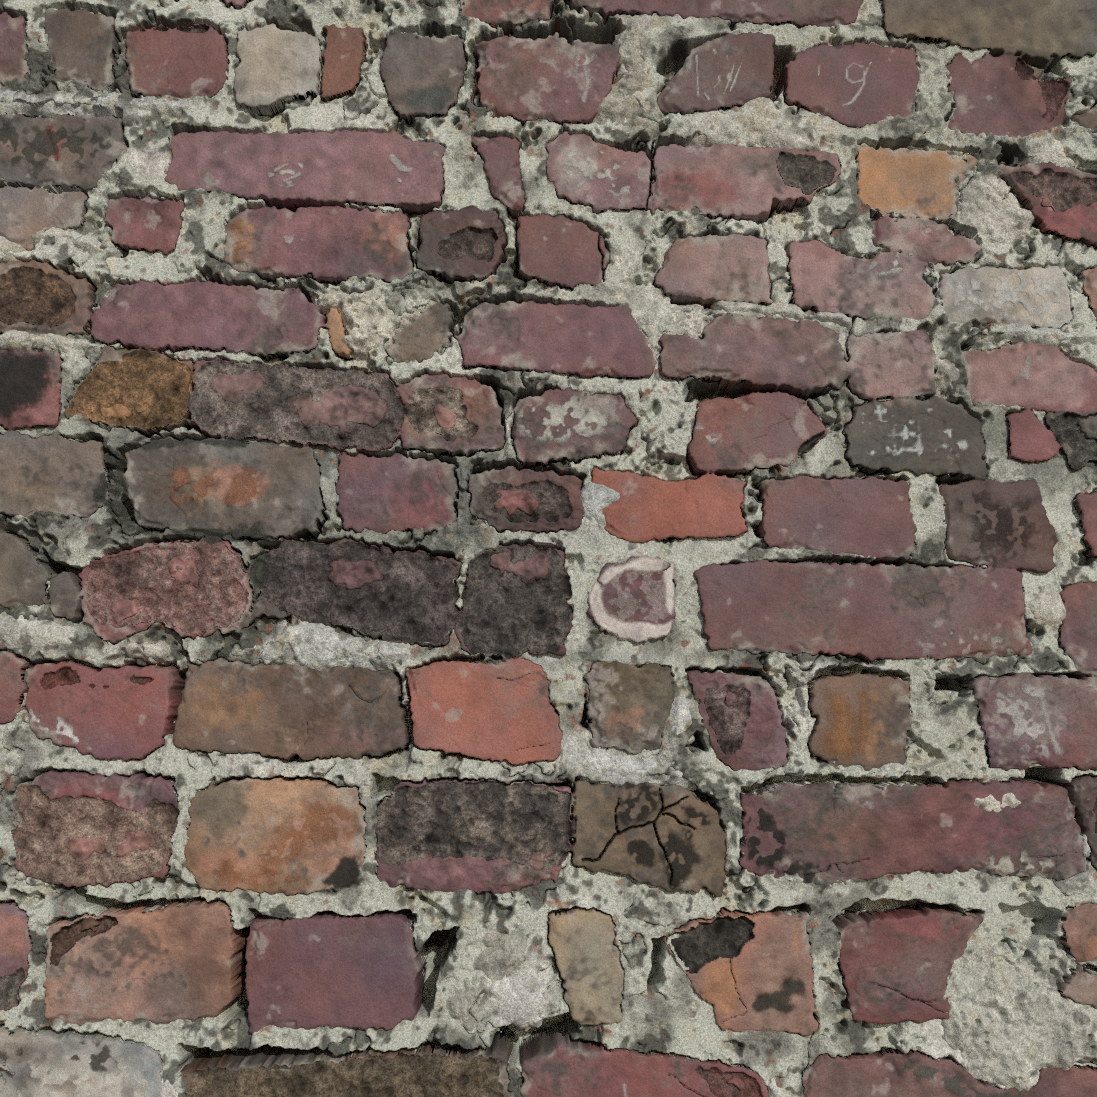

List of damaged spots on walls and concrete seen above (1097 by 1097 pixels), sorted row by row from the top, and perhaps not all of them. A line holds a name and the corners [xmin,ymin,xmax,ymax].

spalling [776,152,837,195]
spalling [1012,168,1097,212]
crack [582,796,695,885]
spalling [666,916,755,974]